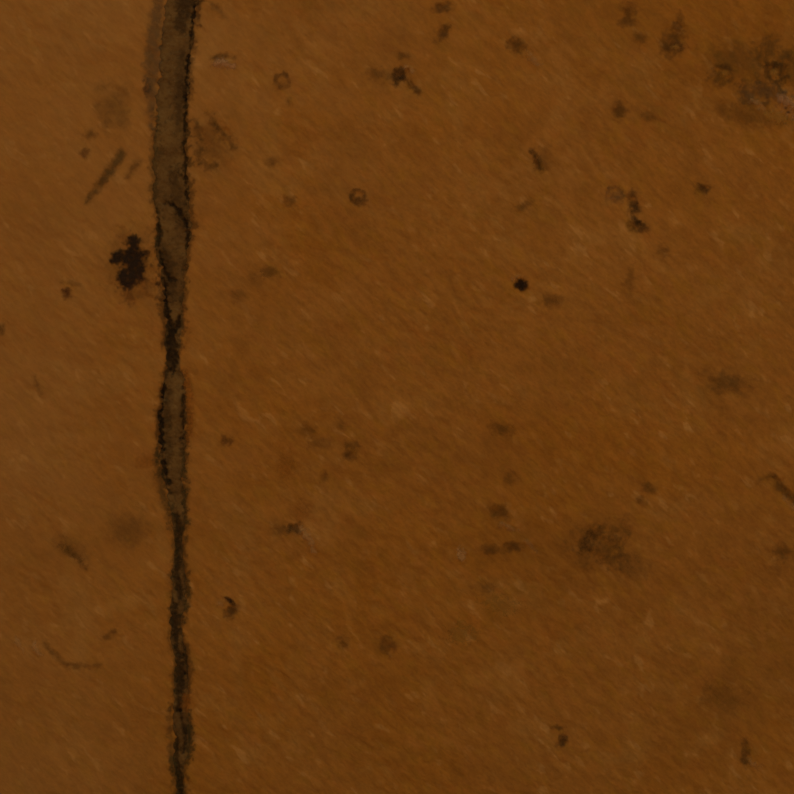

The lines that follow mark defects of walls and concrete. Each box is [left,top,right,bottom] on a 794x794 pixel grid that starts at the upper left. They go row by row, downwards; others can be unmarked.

water stain [109,235,148,289]
crack [151,0,199,794]